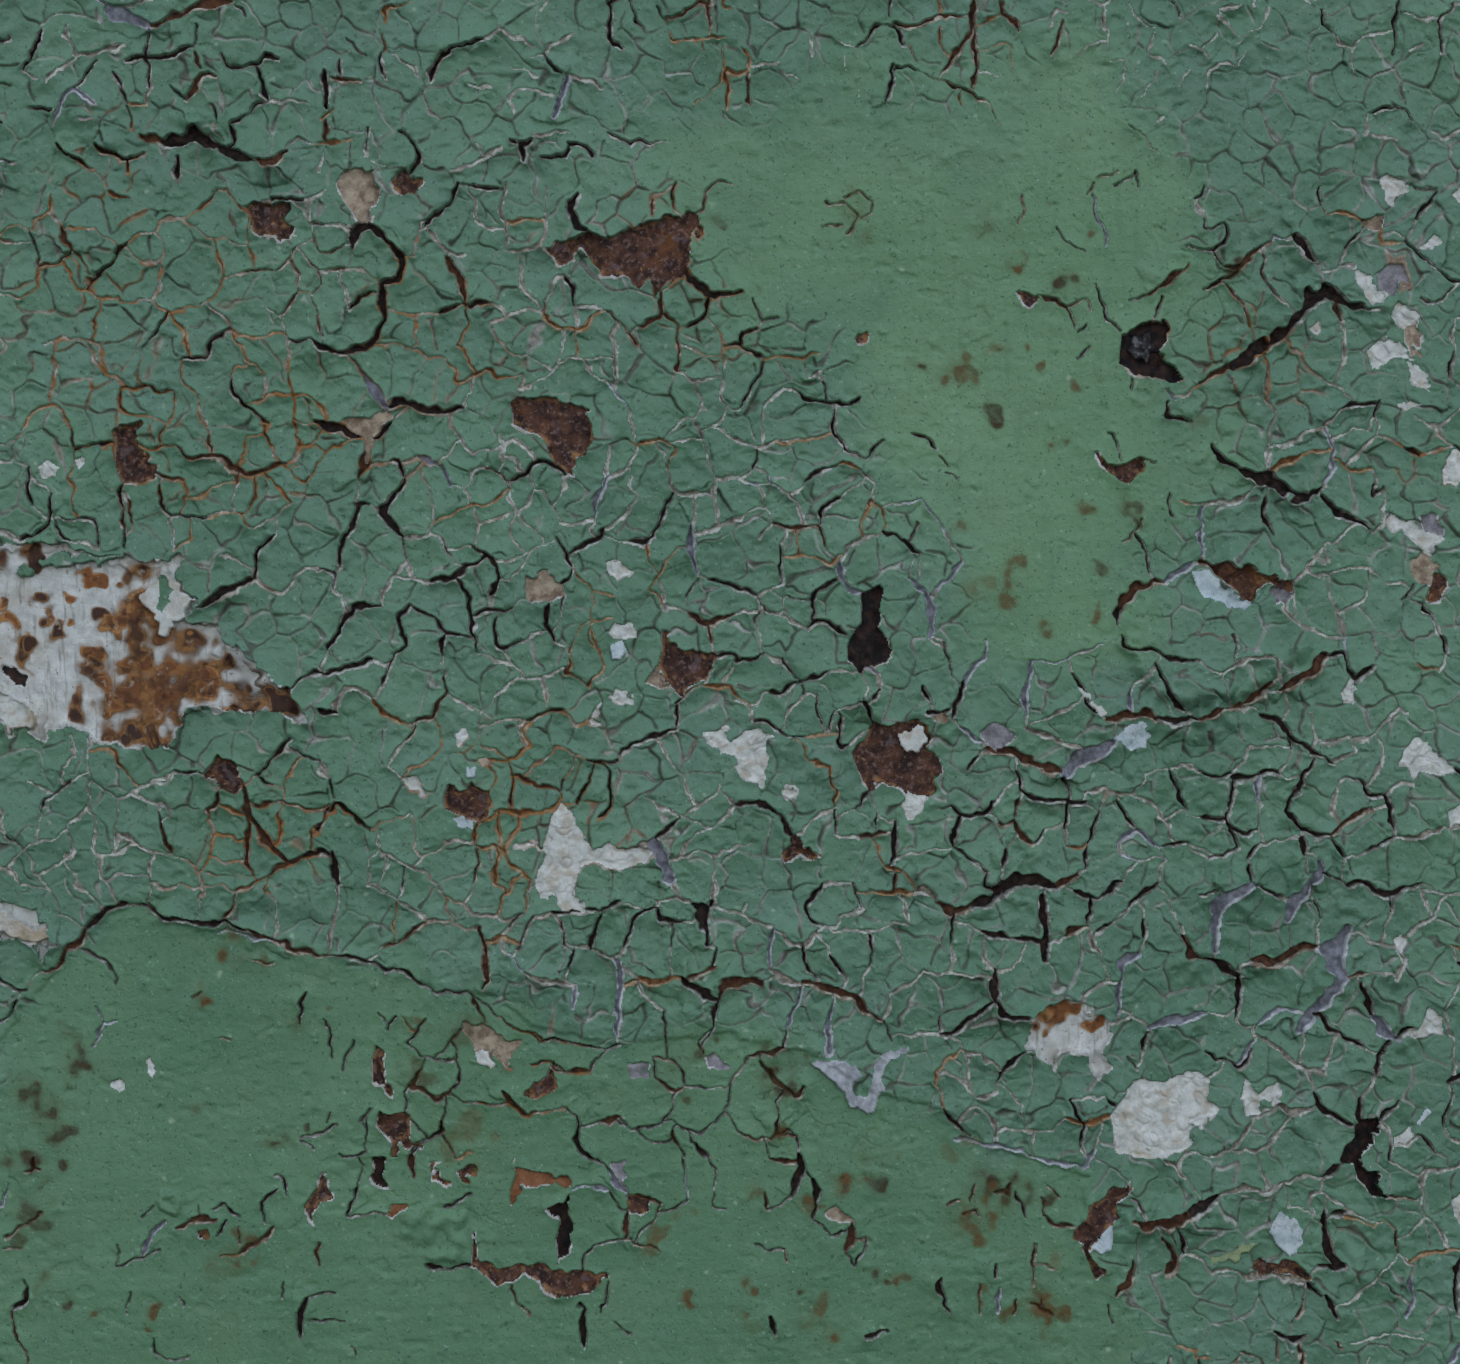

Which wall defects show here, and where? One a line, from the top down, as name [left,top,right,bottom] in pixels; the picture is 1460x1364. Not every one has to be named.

crack [21,0,386,184]
crack [377,2,604,120]
crack [605,0,1280,252]
peeling [0,542,307,750]
crack [0,180,1460,1270]
peeling [898,713,950,753]
peeling [513,803,659,916]
peeling [0,902,56,964]
peeling [1024,999,1113,1082]
crack [116,1174,288,1315]
peeling [1110,1071,1219,1160]
crack [1130,1033,1460,1322]